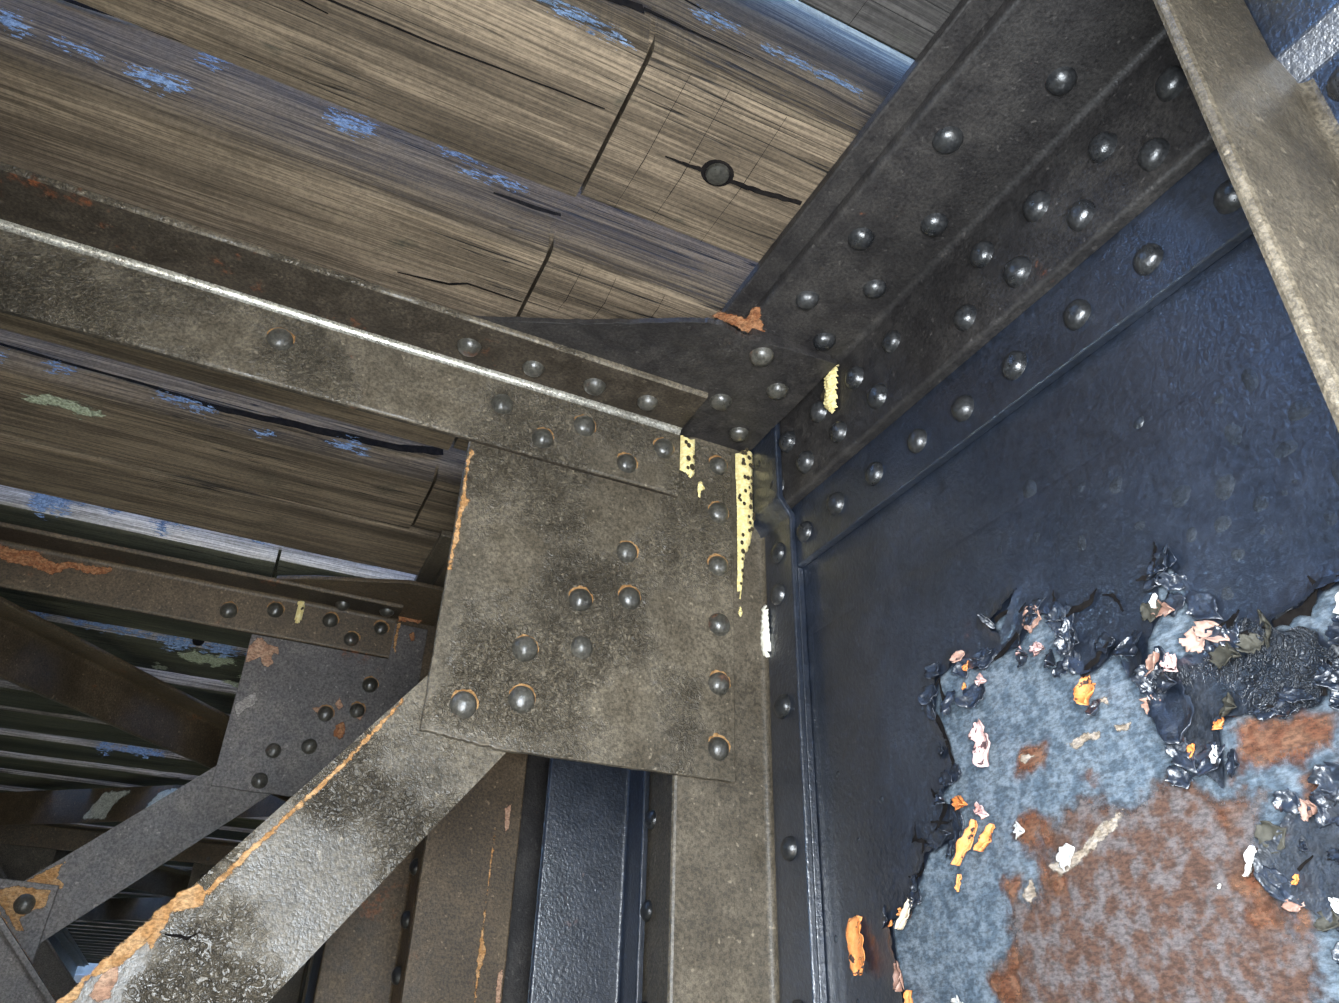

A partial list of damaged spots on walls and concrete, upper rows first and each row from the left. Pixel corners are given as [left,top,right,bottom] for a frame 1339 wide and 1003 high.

corrosion [712,307,765,332]
corrosion [0,544,112,575]
corrosion [246,638,279,667]
peeling [812,330,1339,1003]
corrosion [235,692,258,717]
corrosion [56,697,403,1003]
corrosion [0,862,66,966]